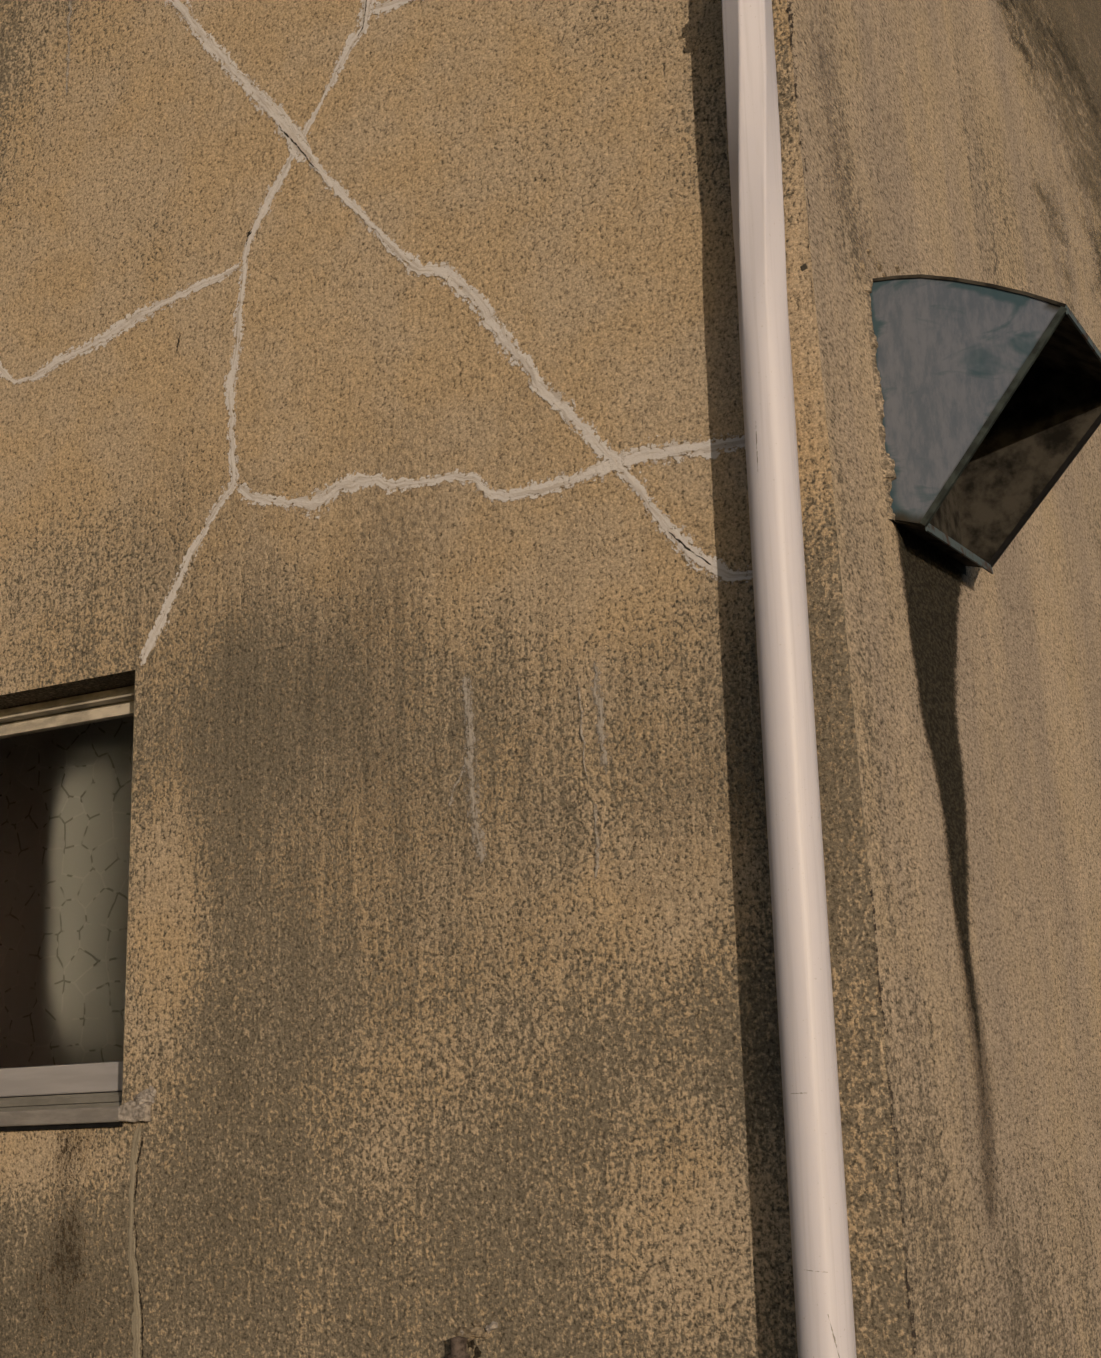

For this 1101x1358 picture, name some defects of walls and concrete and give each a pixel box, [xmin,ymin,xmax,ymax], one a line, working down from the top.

water stain [998,0,1101,310]
crack [0,0,753,666]
crack [127,1124,144,1358]